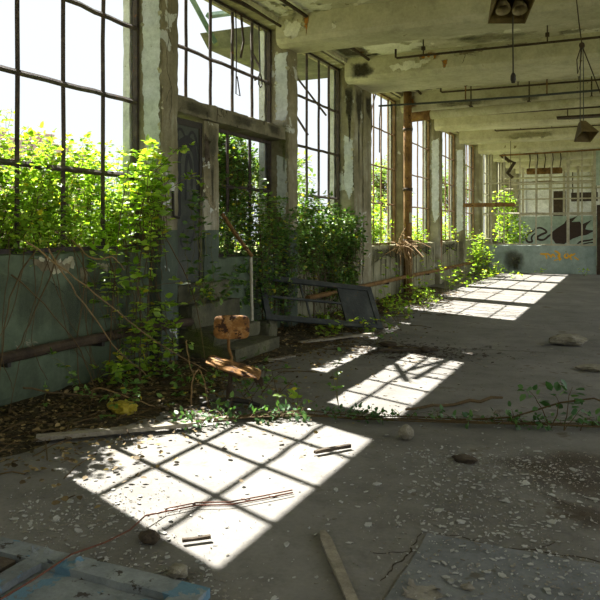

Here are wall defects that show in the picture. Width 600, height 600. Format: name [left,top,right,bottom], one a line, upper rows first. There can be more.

peeling [251,0,332,39]
peeling [273,52,290,122]
mould [336,48,380,78]
peeling [359,42,434,73]
damp [345,89,371,156]
peeling [276,155,288,219]
peeling [343,135,354,199]
peeling [32,256,88,283]
crack [377,533,422,581]